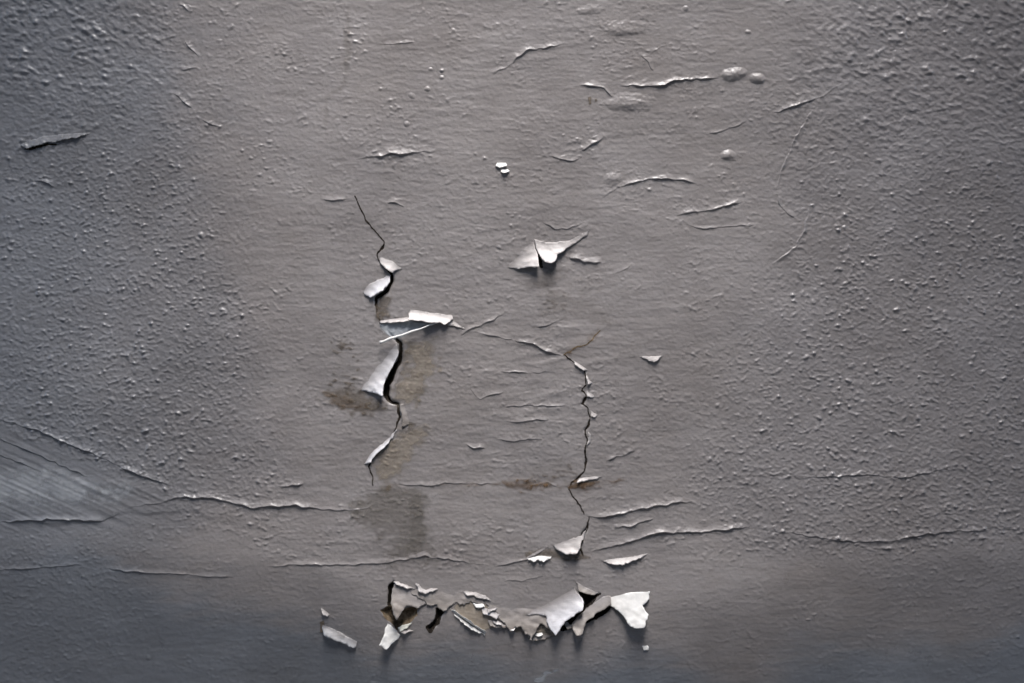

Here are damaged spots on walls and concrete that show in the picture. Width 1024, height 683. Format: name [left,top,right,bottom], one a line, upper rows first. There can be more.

peeling [21,133,89,150]
peeling [508,230,589,269]
crack [354,196,465,491]
crack [514,330,602,556]
peeling [494,530,587,567]
peeling [603,553,648,566]
peeling [320,608,357,648]
peeling [379,581,650,650]